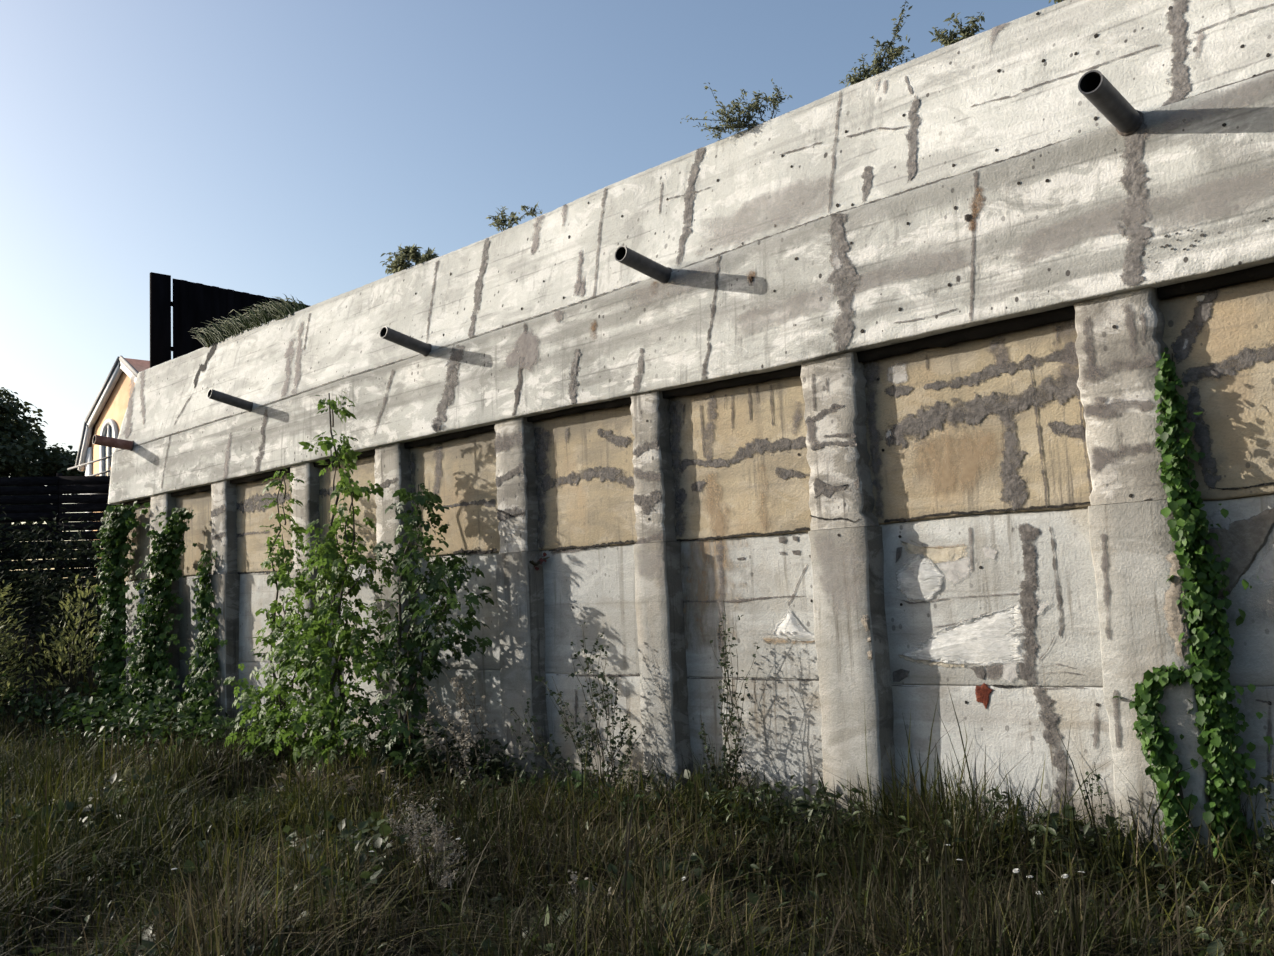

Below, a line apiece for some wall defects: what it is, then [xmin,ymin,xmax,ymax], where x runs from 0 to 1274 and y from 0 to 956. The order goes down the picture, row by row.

peeling [896,541,971,583]
peeling [893,605,1024,682]
rust [975,683,993,709]